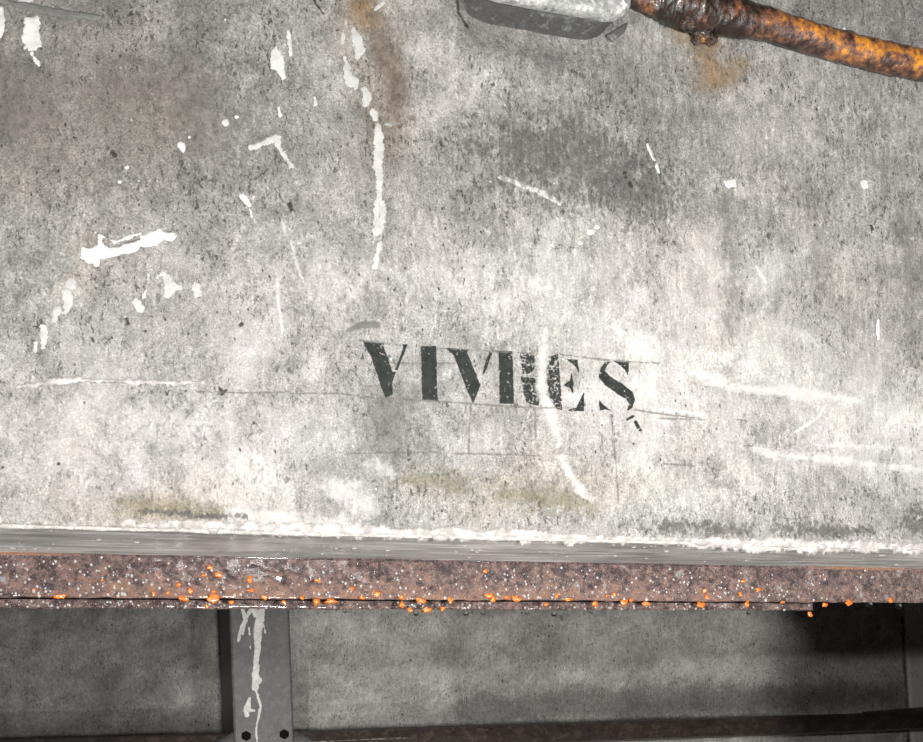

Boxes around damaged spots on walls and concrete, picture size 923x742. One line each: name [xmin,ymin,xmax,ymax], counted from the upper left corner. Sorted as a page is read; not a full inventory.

rust [151,582,194,602]
rust [204,590,234,608]
rust [299,596,339,606]
rust [397,595,454,613]
rust [484,593,522,602]
rust [592,592,651,607]